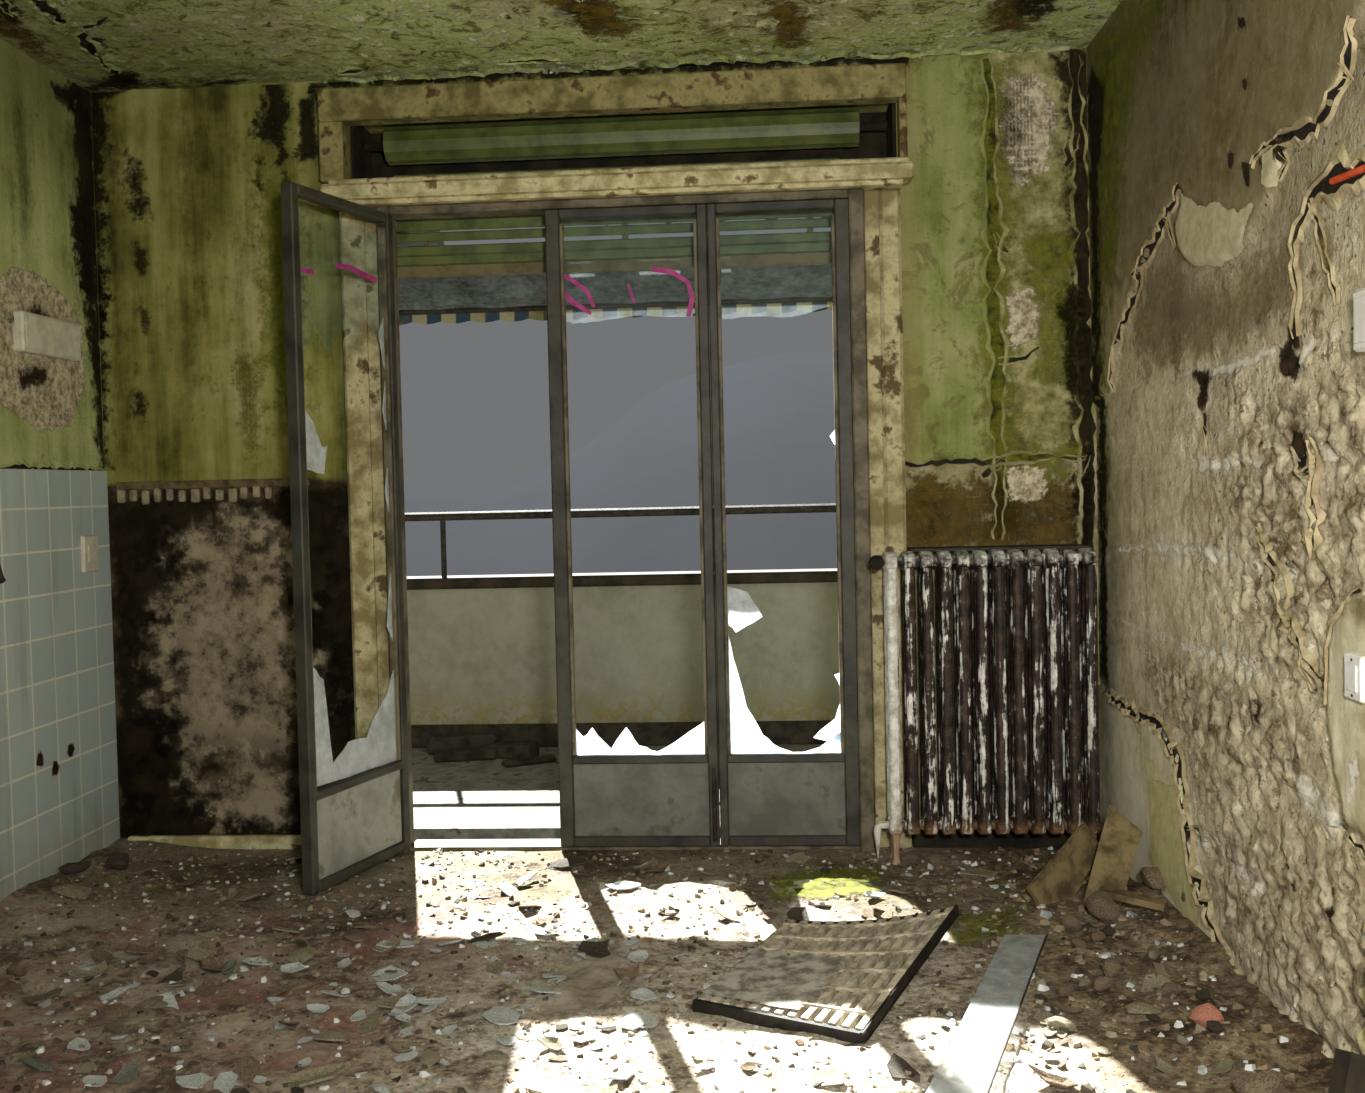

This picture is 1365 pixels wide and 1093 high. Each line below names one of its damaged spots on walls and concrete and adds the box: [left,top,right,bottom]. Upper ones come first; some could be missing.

spalling [0,267,85,431]
crack [0,459,103,471]
leakage [0,0,246,470]
leakage [108,490,301,838]
leakage [308,486,355,762]
corrosion [539,0,645,42]
crack [322,46,1244,975]
leakage [906,49,1300,694]
peeling [1175,137,1286,267]
spalling [1139,327,1365,1055]
crack [1249,14,1357,181]
crack [1308,197,1340,306]